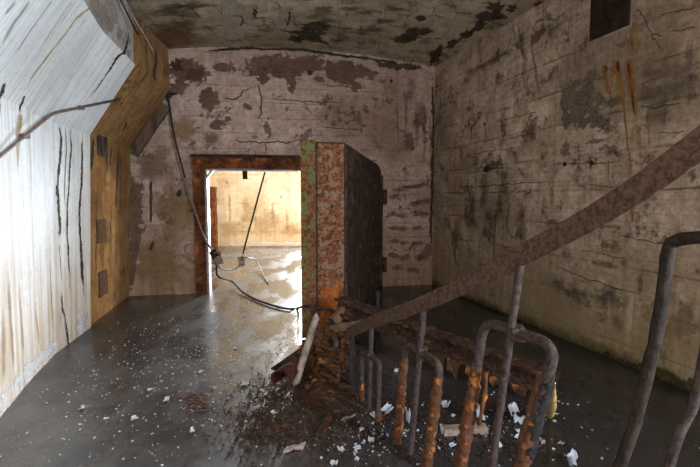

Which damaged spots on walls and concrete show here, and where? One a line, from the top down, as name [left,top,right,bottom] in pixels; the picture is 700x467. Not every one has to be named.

spalling [281,21,337,45]
spalling [394,15,435,44]
crack [638,8,695,48]
crack [91,34,147,104]
flaking render [206,116,232,142]
crack [236,136,293,154]
flaking render [169,52,379,112]
crack [225,84,347,119]
crack [553,158,623,166]
corrosion [602,60,641,163]
leakage [136,151,193,289]
crack [551,250,639,294]